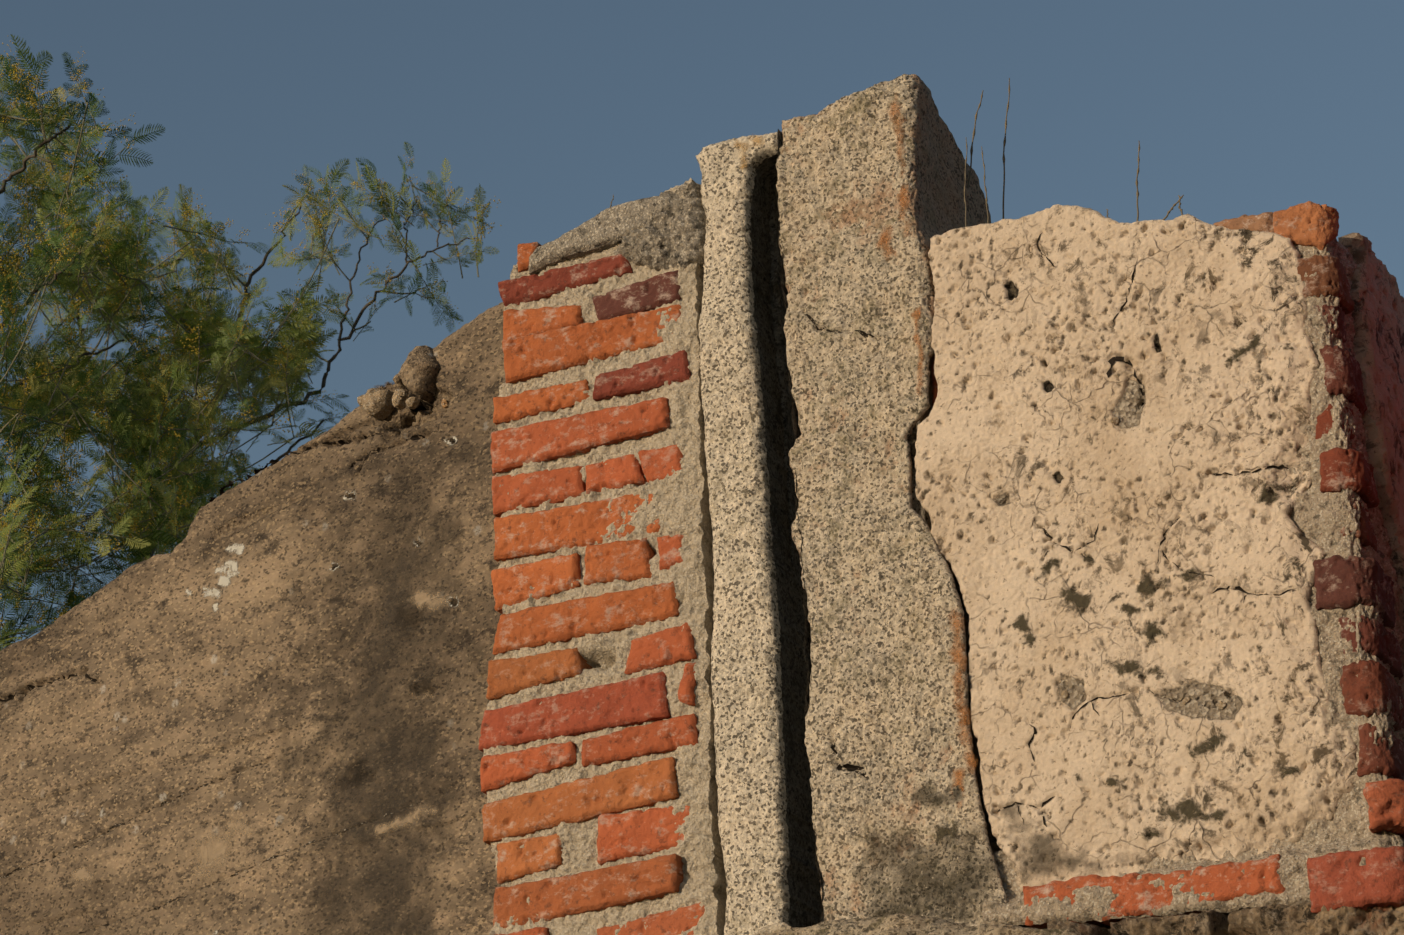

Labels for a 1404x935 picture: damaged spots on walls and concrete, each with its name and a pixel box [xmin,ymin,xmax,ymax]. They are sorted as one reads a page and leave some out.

crack [0,673,100,702]
crack [0,759,274,878]
crack [77,790,449,935]